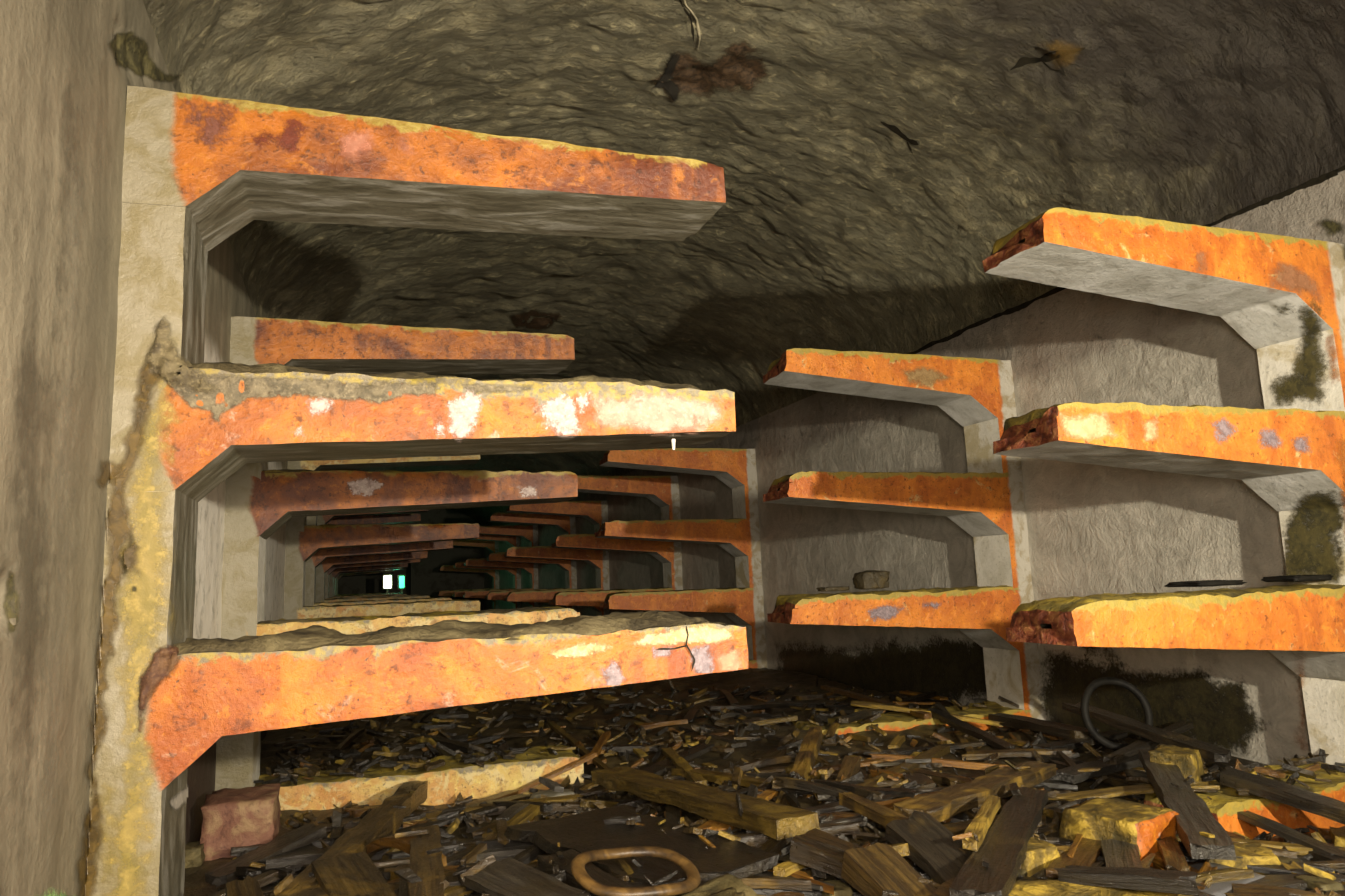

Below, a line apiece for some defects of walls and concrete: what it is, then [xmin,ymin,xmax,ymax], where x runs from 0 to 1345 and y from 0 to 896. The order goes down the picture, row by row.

spalling [145,318,437,421]
peeling [437,384,531,442]
spalling [510,309,562,330]
mould [1270,304,1327,405]
mould [1284,491,1344,584]
damp [78,361,173,896]